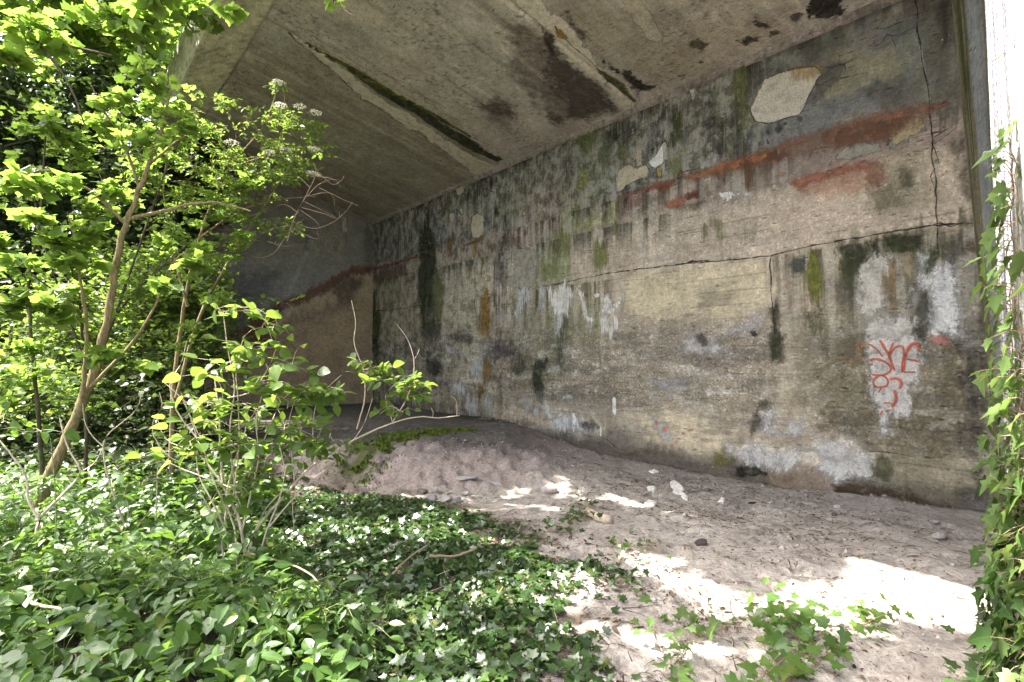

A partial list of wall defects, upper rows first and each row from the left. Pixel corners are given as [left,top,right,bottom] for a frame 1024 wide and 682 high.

peeling [288,27,495,176]
leakage [542,31,616,127]
leakage [602,60,656,91]
flaking render [750,66,823,146]
flaking render [614,146,649,195]
crack [449,0,973,328]
corrosion [617,102,949,209]
leakage [422,275,458,355]
leakage [514,231,625,341]
leakage [839,232,961,434]
leakage [724,407,804,477]